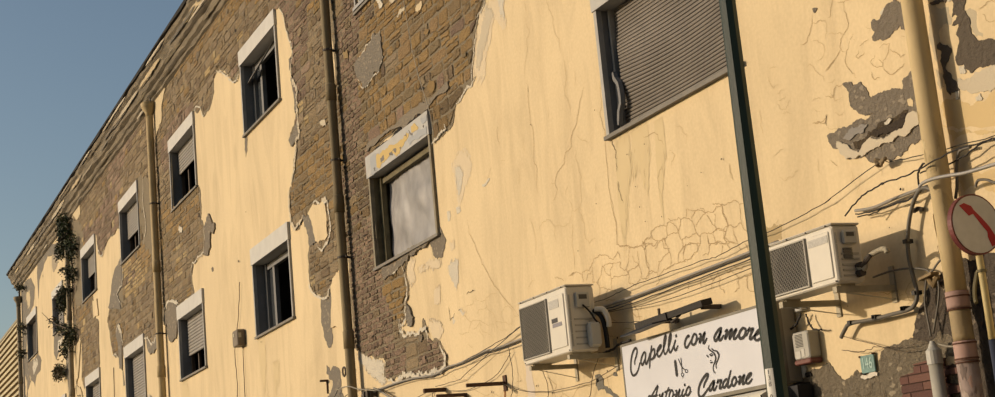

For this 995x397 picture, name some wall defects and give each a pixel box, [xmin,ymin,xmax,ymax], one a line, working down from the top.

crack [801,0,905,130]
spalling [827,71,921,163]
spalling [929,0,995,95]
spalling [21,0,485,397]
spalling [792,272,961,397]
spalling [962,252,995,397]